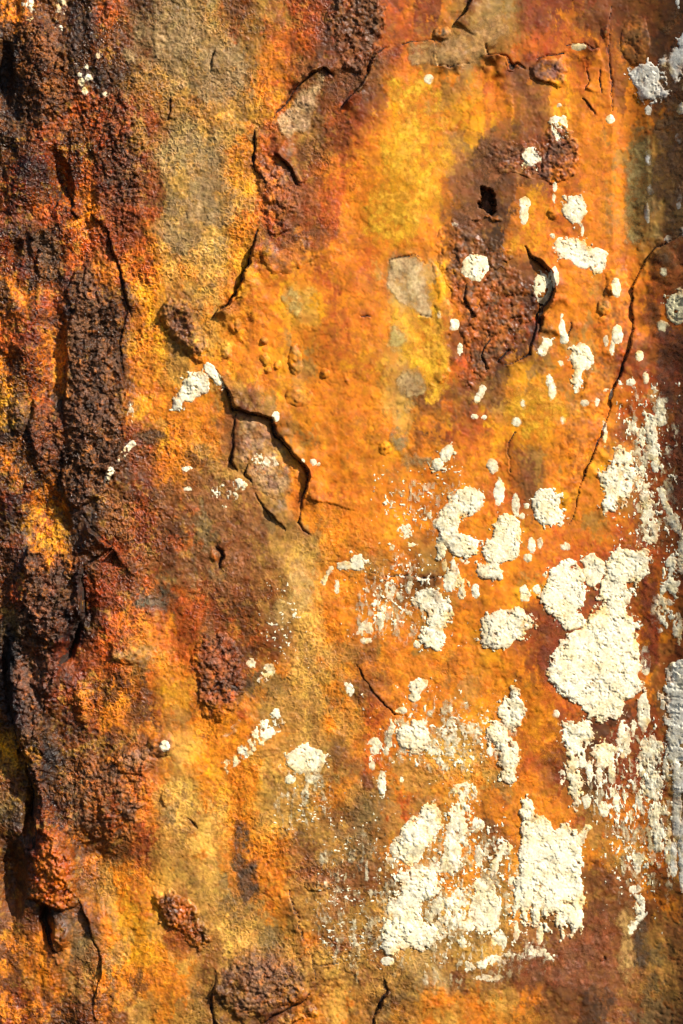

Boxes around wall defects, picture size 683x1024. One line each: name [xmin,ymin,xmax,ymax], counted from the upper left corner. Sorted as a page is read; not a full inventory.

crack [51,187,132,373]
corrosion [60,262,166,510]
crack [212,229,259,318]
crack [224,386,314,534]
crack [463,246,572,372]
crack [569,239,675,524]
corrosion [625,53,683,507]
corrosion [7,537,126,913]
corrosion [207,707,259,902]
corrosion [485,613,572,753]
corrosion [639,567,660,672]
corrosion [150,887,213,952]